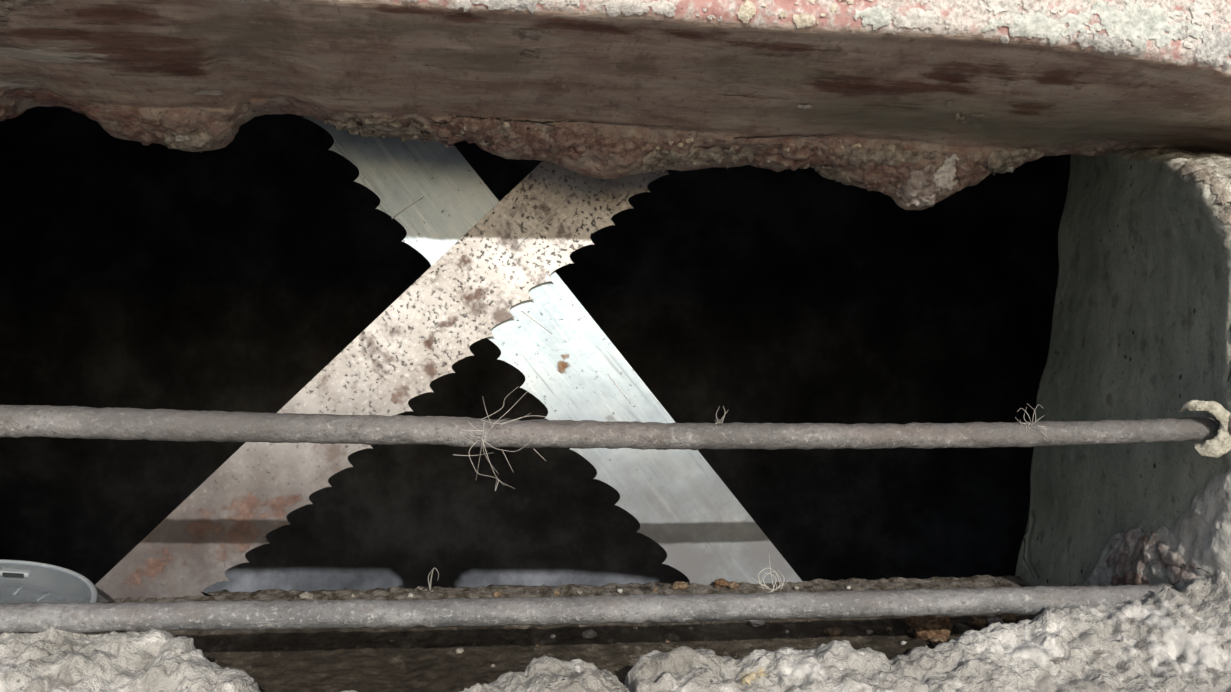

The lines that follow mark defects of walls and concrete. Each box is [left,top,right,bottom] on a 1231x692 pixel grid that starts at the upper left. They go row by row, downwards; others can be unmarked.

leakage [0,0,224,96]
leakage [376,7,488,23]
peeling [455,0,549,14]
leakage [533,19,631,35]
peeling [603,0,676,17]
leakage [665,30,828,57]
peeling [779,0,1231,69]
leakage [809,64,1015,98]
leakage [1035,71,1085,85]
spalling [116,119,226,153]
spalling [323,113,1044,210]
spalling [1106,528,1199,586]